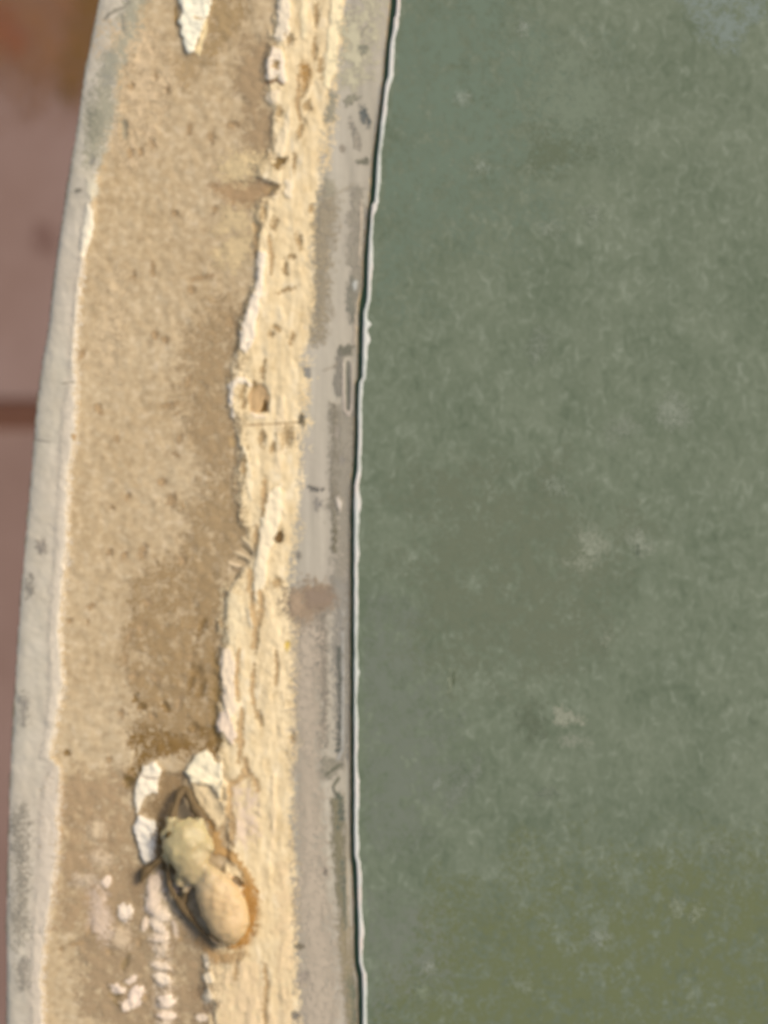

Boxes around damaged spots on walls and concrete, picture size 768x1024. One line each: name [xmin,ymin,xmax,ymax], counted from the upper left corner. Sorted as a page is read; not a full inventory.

peeling [178,0,212,56]
peeling [186,0,342,353]
peeling [24,154,306,1024]